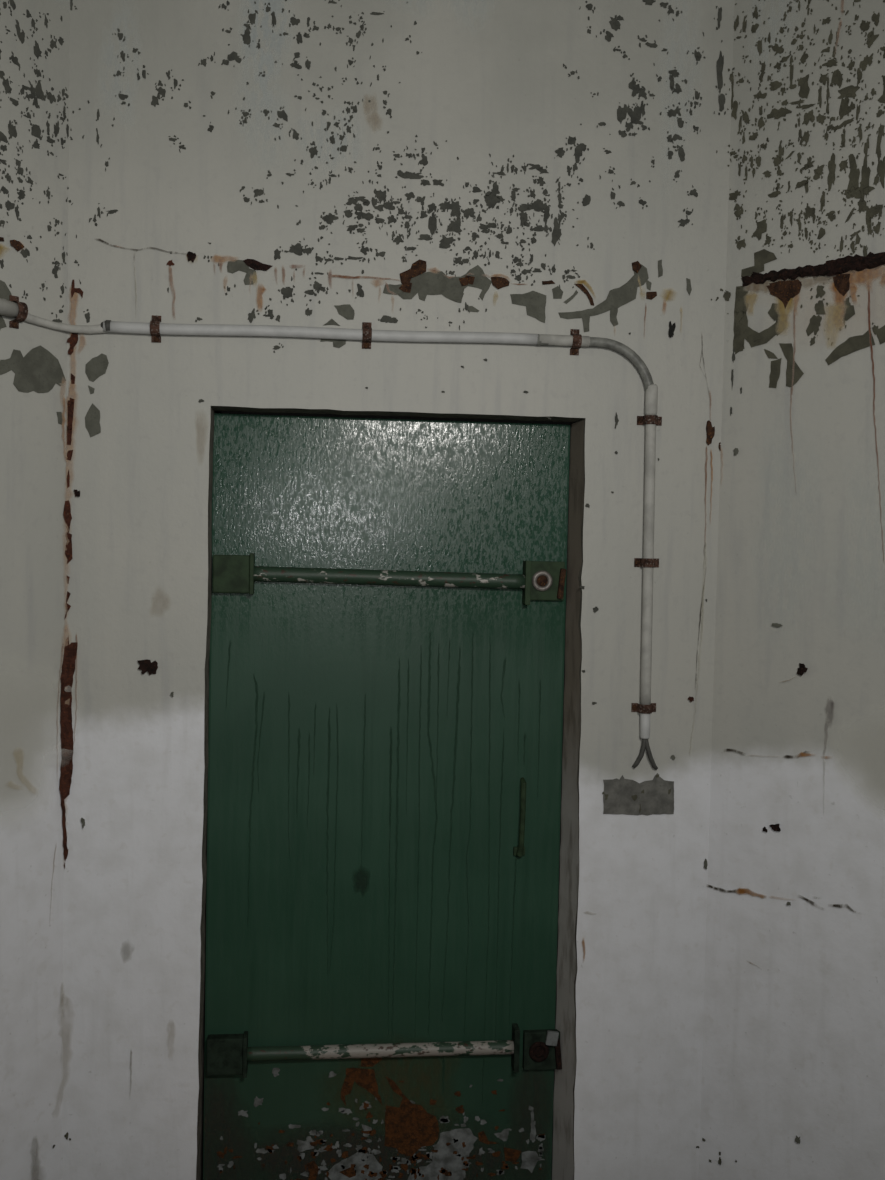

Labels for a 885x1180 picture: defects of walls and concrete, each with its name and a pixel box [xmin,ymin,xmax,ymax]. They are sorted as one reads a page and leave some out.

peeling [0,0,118,227]
peeling [198,0,663,348]
peeling [579,0,702,227]
spalling [687,0,885,394]
corrosion [213,255,305,309]
corrosion [329,259,475,294]
corrosion [491,274,525,298]
peeling [0,345,66,393]
corrosion [745,267,885,559]
water stain [824,700,834,751]
water stain [845,712,885,803]
corrosion [262,1058,521,1180]